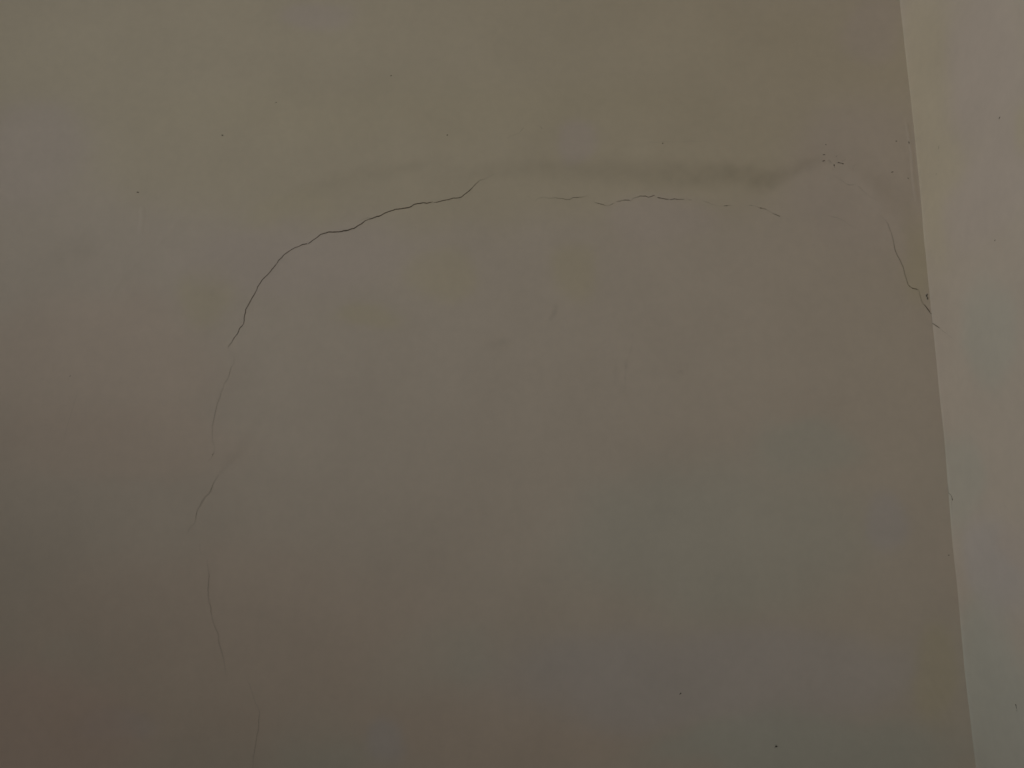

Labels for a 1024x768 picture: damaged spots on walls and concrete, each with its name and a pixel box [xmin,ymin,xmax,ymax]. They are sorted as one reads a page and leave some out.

crack [234,187,473,338]